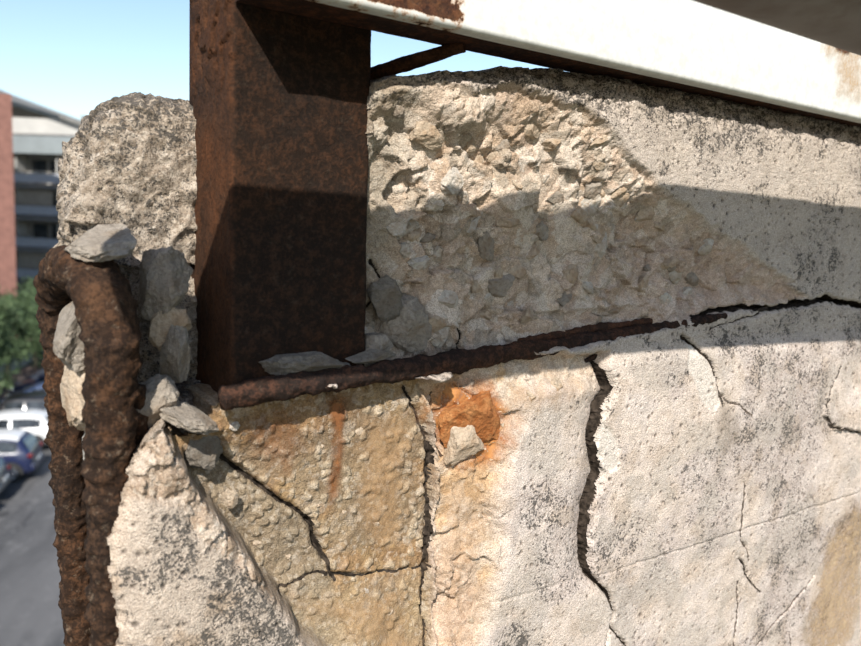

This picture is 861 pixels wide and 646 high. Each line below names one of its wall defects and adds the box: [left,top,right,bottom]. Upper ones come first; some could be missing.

spalling [364,66,805,367]
rust [132,384,149,455]
crack [219,385,443,646]
spalling [107,341,607,646]
rust [433,383,505,443]
rust [517,318,653,341]
crack [577,361,626,646]
spalling [593,423,619,472]
spalling [687,345,719,412]
crack [680,294,861,417]
crack [825,366,861,434]
water stain [808,511,861,646]